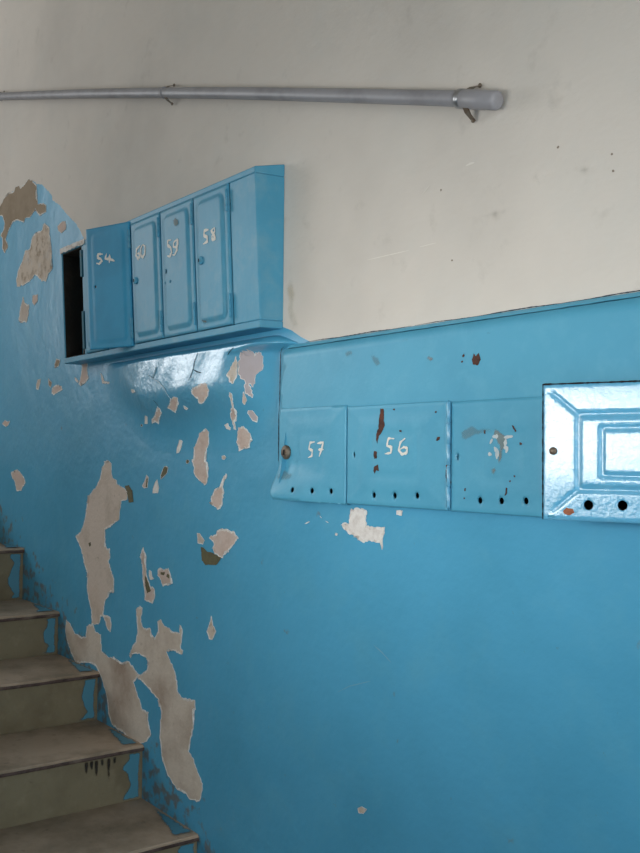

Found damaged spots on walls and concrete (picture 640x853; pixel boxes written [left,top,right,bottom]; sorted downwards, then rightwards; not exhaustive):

peeling [0,179,66,287]
peeling [18,294,38,323]
peeling [225,349,264,451]
peeling [11,469,26,491]
peeling [186,428,227,510]
corrosion [373,409,395,474]
peeling [197,528,239,565]
peeling [335,507,385,549]
peeling [65,460,203,802]